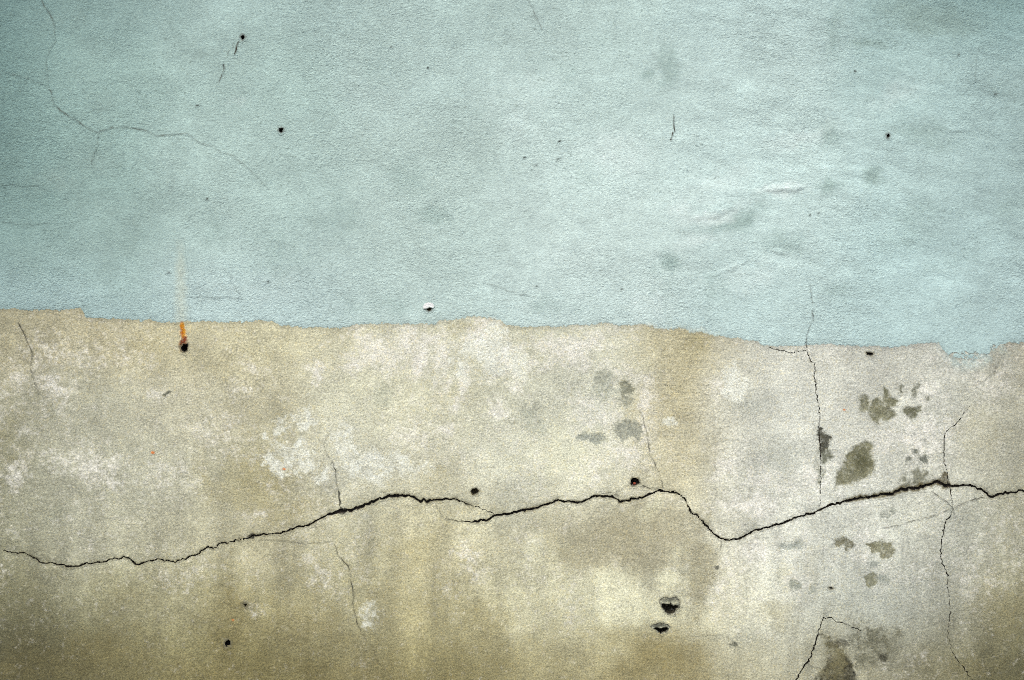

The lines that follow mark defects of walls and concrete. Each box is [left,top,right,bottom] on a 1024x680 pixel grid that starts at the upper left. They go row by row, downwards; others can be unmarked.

crack [0,0,269,190]
flaking render [0,308,1024,680]
crack [4,285,1024,680]
water stain [552,322,755,680]
water stain [811,444,836,491]
mould [895,464,936,490]